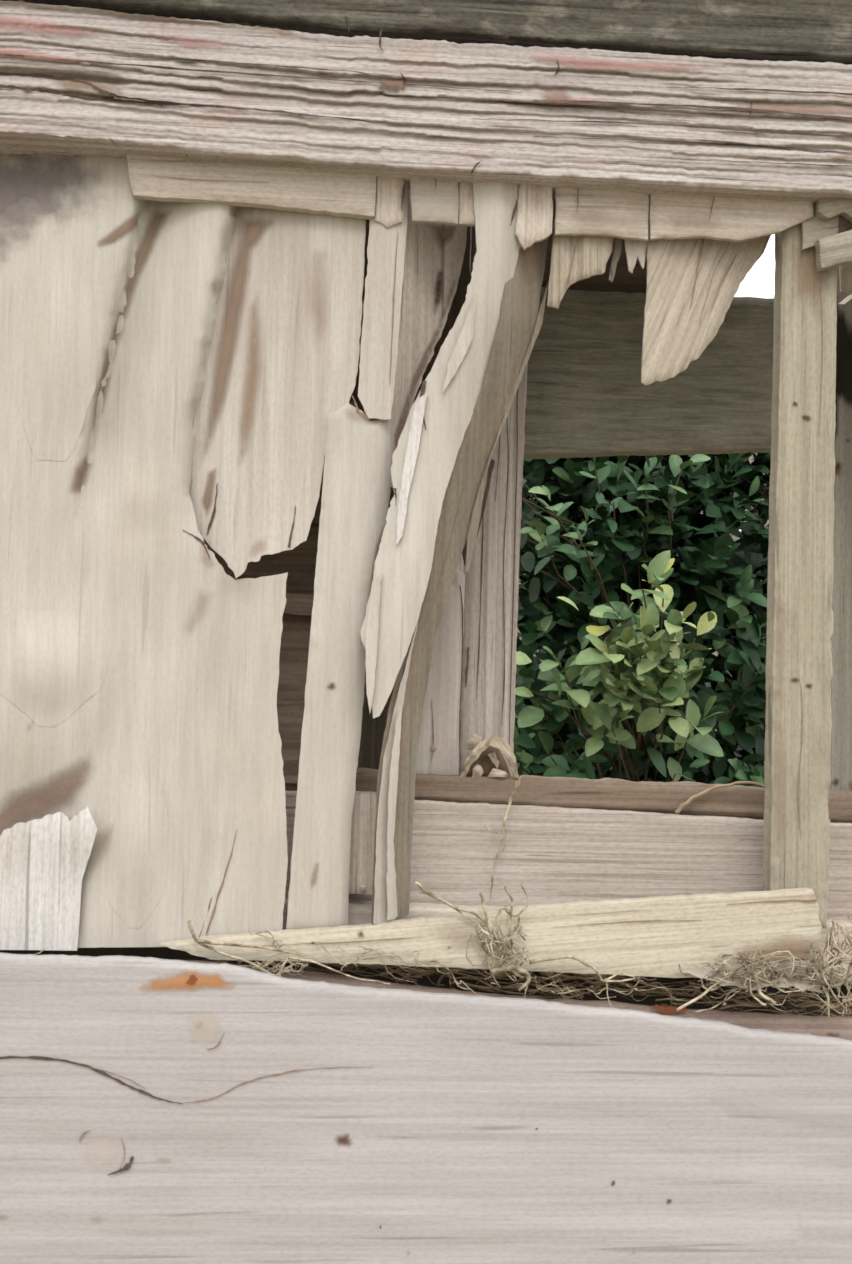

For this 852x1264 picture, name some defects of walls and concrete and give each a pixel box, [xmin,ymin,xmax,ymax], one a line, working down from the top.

leakage [835,310,852,436]
peeling [396,393,427,545]
peeling [365,572,382,711]
rust [151,973,226,989]
crack [0,1056,360,1104]